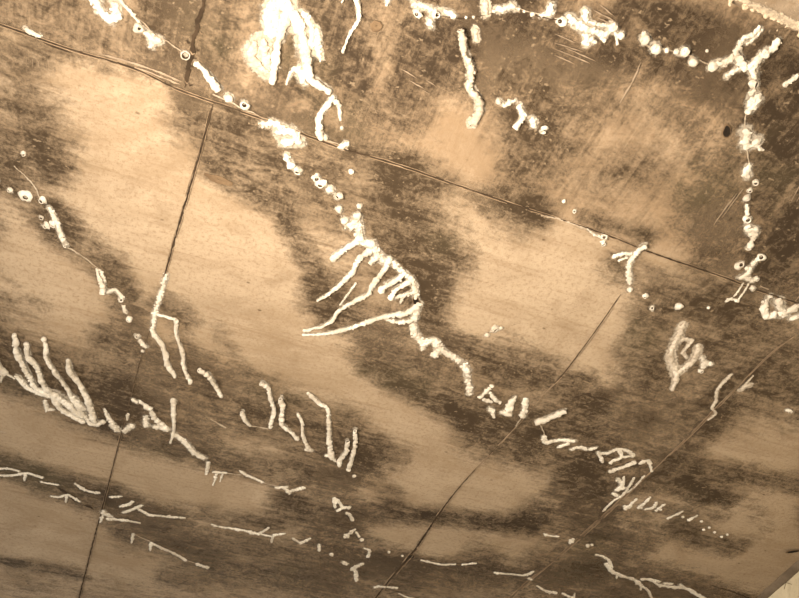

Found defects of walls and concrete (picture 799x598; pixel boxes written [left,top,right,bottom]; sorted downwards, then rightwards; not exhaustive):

damp [647,95,698,133]
damp [578,145,674,201]
damp [637,496,751,557]
damp [0,558,92,591]
damp [562,590,585,598]